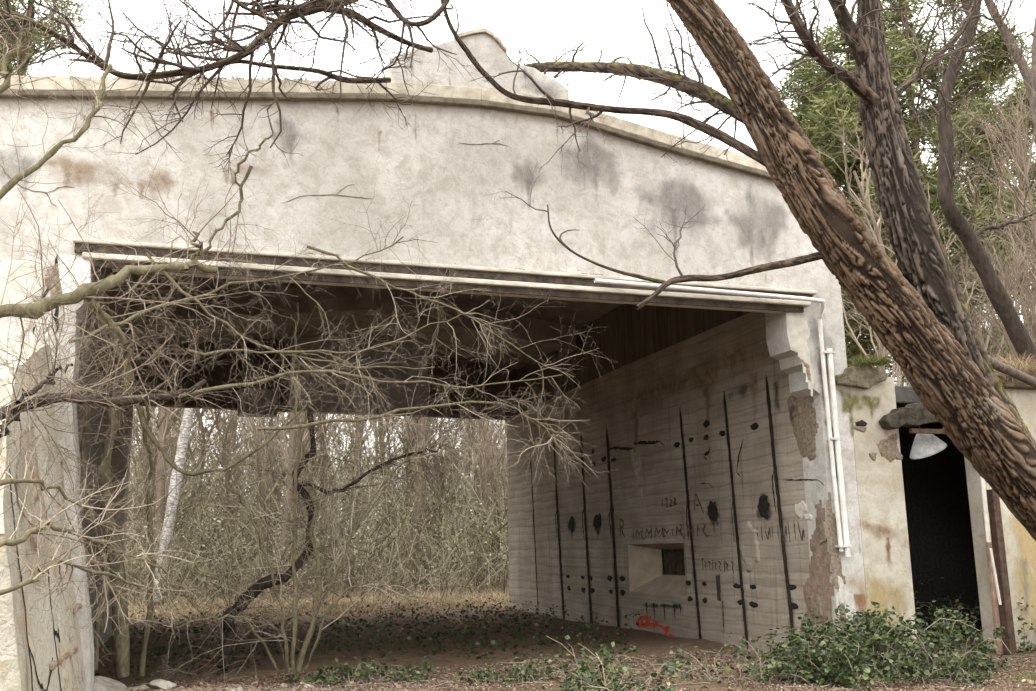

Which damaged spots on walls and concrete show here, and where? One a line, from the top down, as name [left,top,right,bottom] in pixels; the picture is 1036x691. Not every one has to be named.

damp [738,207,785,244]
spalling [795,492,847,647]